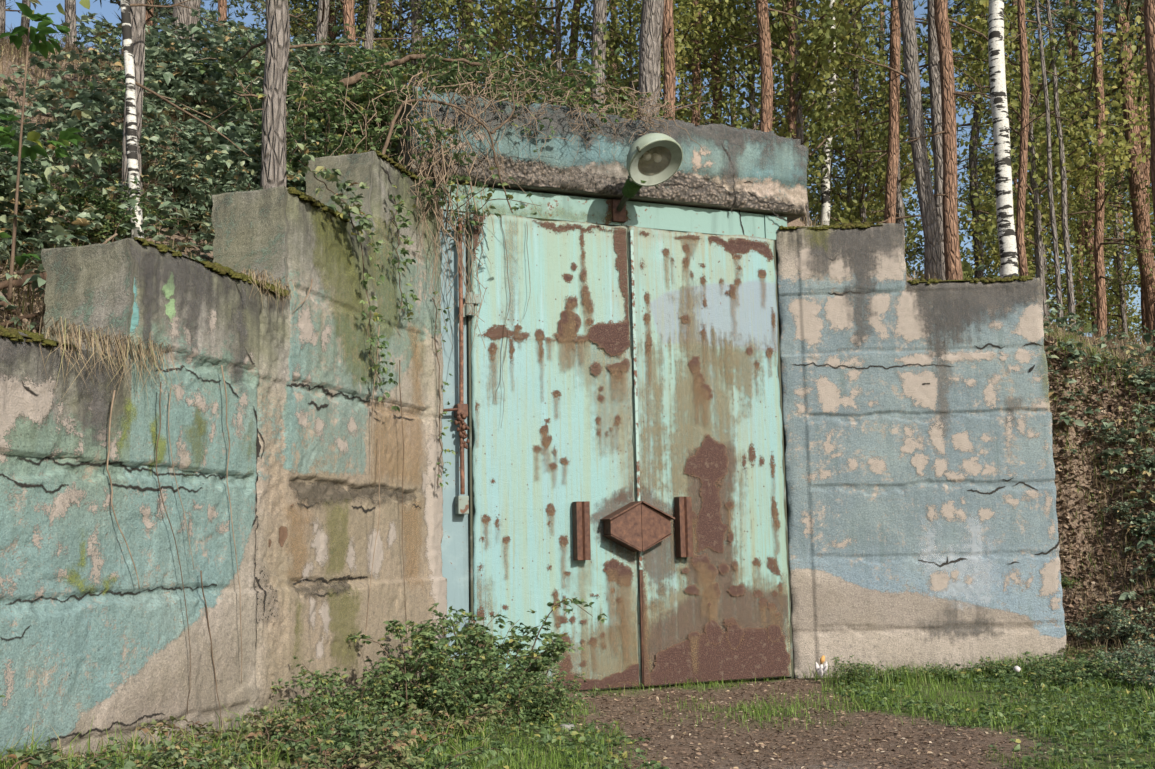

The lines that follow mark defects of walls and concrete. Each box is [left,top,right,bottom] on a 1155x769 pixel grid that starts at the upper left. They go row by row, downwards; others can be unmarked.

spalling [421,119,804,214]
peeling [0,337,122,463]
crack [1,584,217,641]
crack [0,456,226,493]
crack [155,365,267,650]
crack [293,575,367,597]
peeling [290,433,448,660]
rust [477,198,792,692]
peeling [786,243,1051,483]
crack [918,557,966,567]
damp [910,278,1041,435]
peeling [925,488,1061,610]